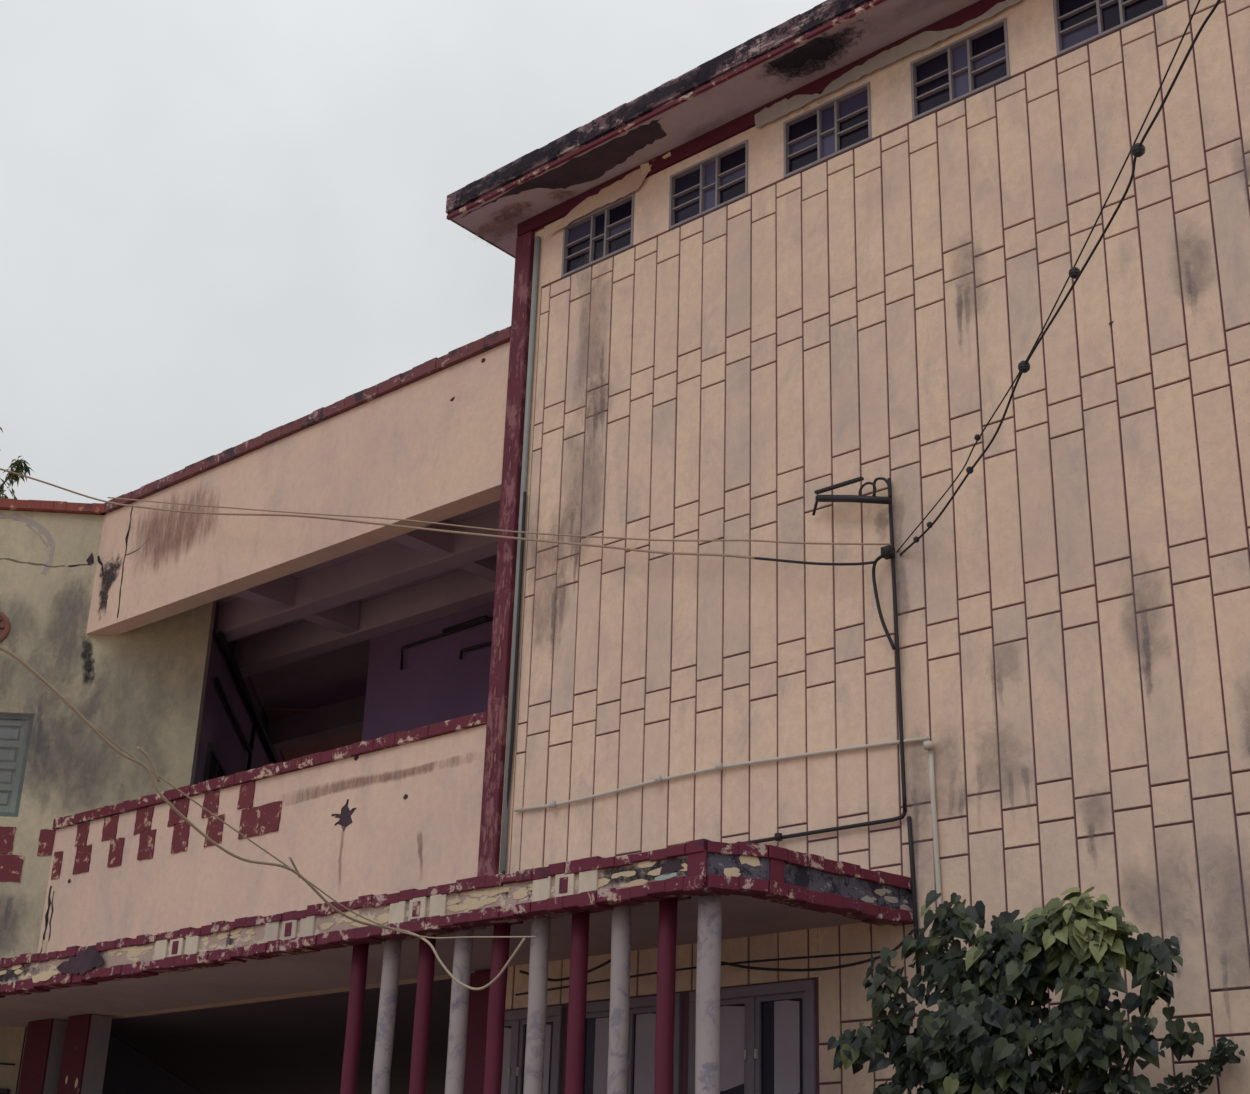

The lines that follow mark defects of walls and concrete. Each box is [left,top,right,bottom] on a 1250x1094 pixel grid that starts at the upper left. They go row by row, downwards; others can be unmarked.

peeling [755,0,1021,128]
crack [0,507,140,618]
water stain [99,558,120,611]
water stain [81,640,94,682]
spalling [331,799,356,832]
peeling [598,857,687,888]
peeling [724,855,760,877]
peeling [860,888,912,911]
peeling [201,928,255,949]
spalling [0,946,154,983]